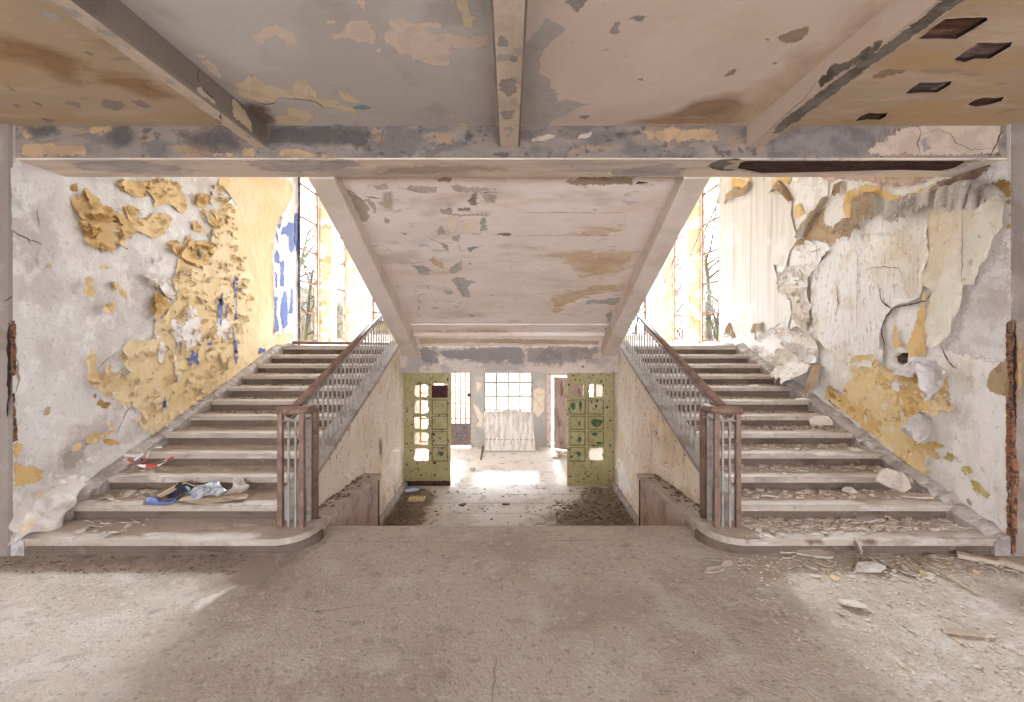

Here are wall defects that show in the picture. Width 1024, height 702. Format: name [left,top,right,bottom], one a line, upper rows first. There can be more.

damp [1,40,74,76]
peeling [326,0,589,142]
damp [646,98,743,124]
crack [917,108,1019,157]
peeling [21,54,371,435]
peeling [708,0,1022,554]
crack [835,257,931,366]
peeling [8,393,92,546]